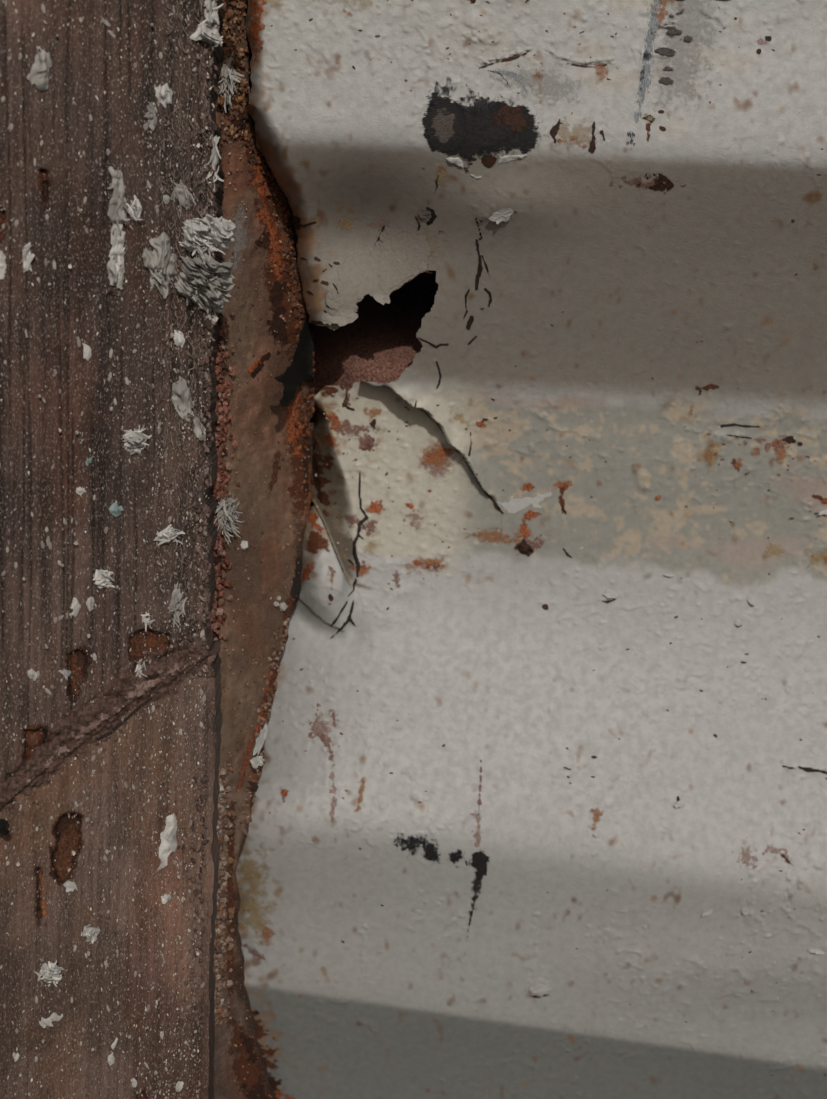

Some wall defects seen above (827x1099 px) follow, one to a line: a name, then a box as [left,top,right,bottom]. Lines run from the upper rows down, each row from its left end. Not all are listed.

corrosion [247,0,267,66]
peeling [476,46,615,68]
peeling [550,119,605,153]
peeling [643,110,666,141]
corrosion [231,108,300,361]
corrosion [419,443,451,476]
corrosion [732,436,803,472]
corrosion [554,481,572,514]
corrosion [473,510,543,556]
crack [330,473,368,638]
corrosion [393,559,445,587]
corrosion [226,651,294,1099]